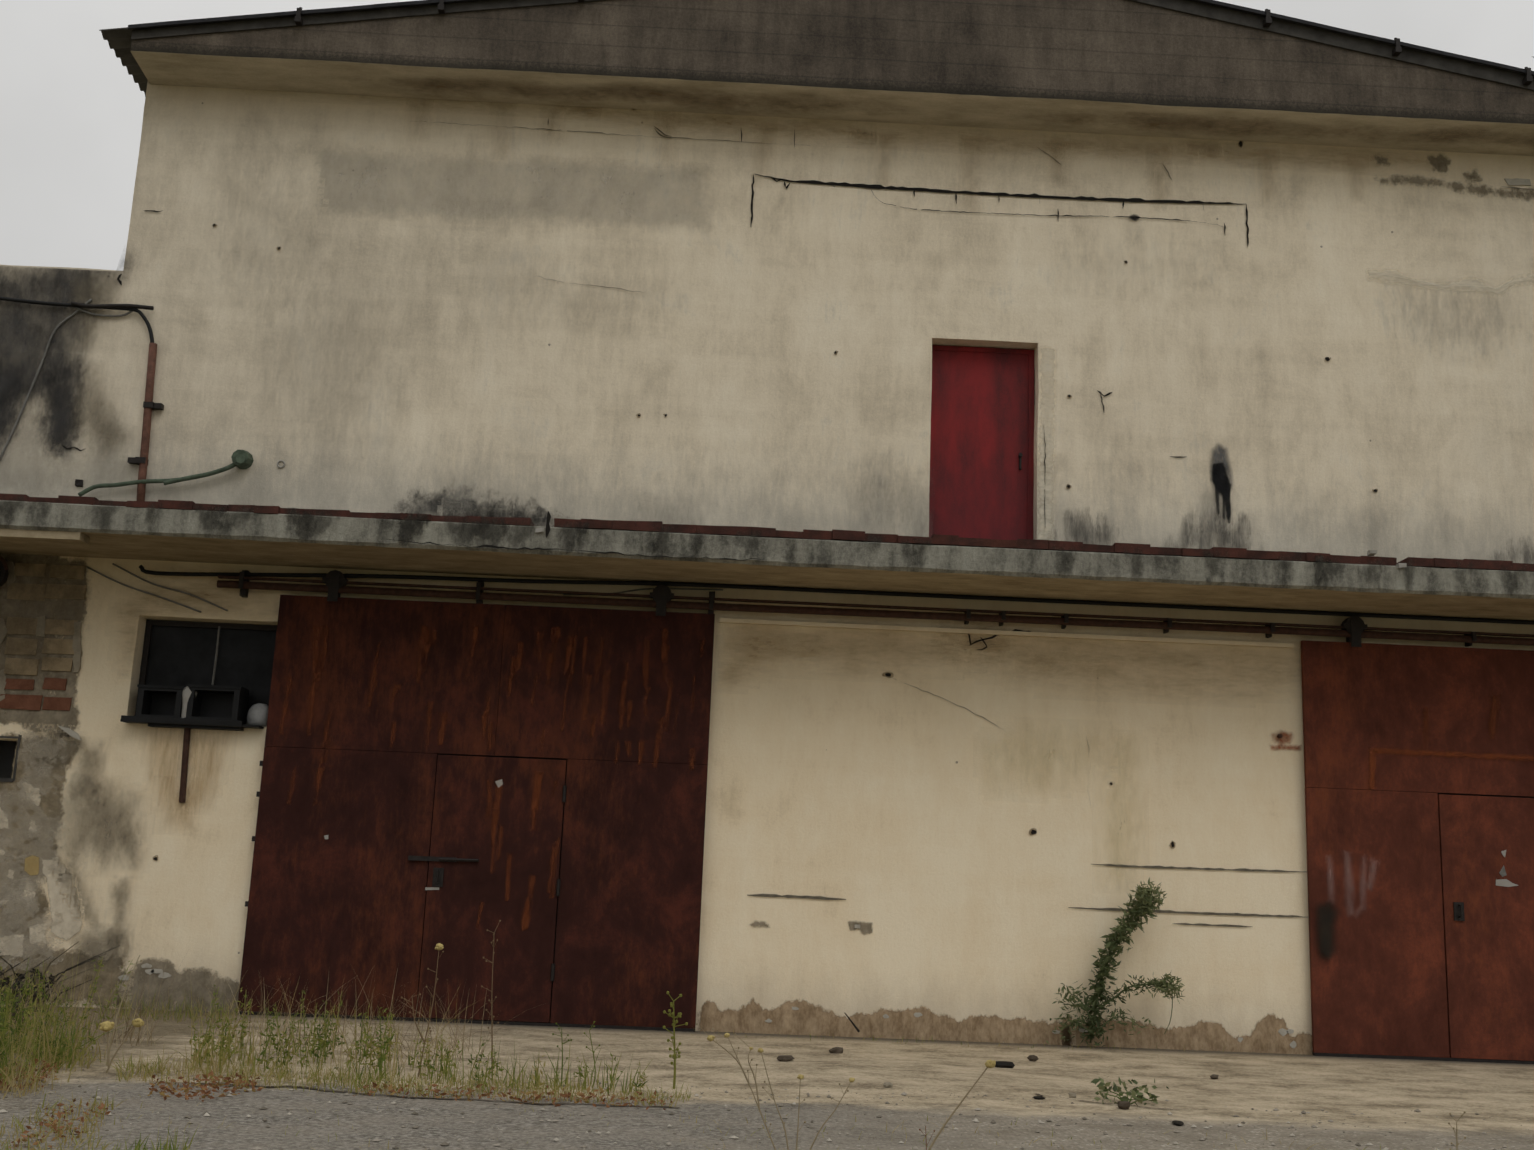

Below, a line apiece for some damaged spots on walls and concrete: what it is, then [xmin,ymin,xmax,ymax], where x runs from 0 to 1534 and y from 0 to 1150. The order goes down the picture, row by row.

crack [424,118,1249,246]
spalling [1375,155,1534,200]
water stain [0,268,118,446]
water stain [398,491,573,551]
spalling [0,553,240,1013]
water stain [80,934,120,964]
peeling [698,998,1313,1055]